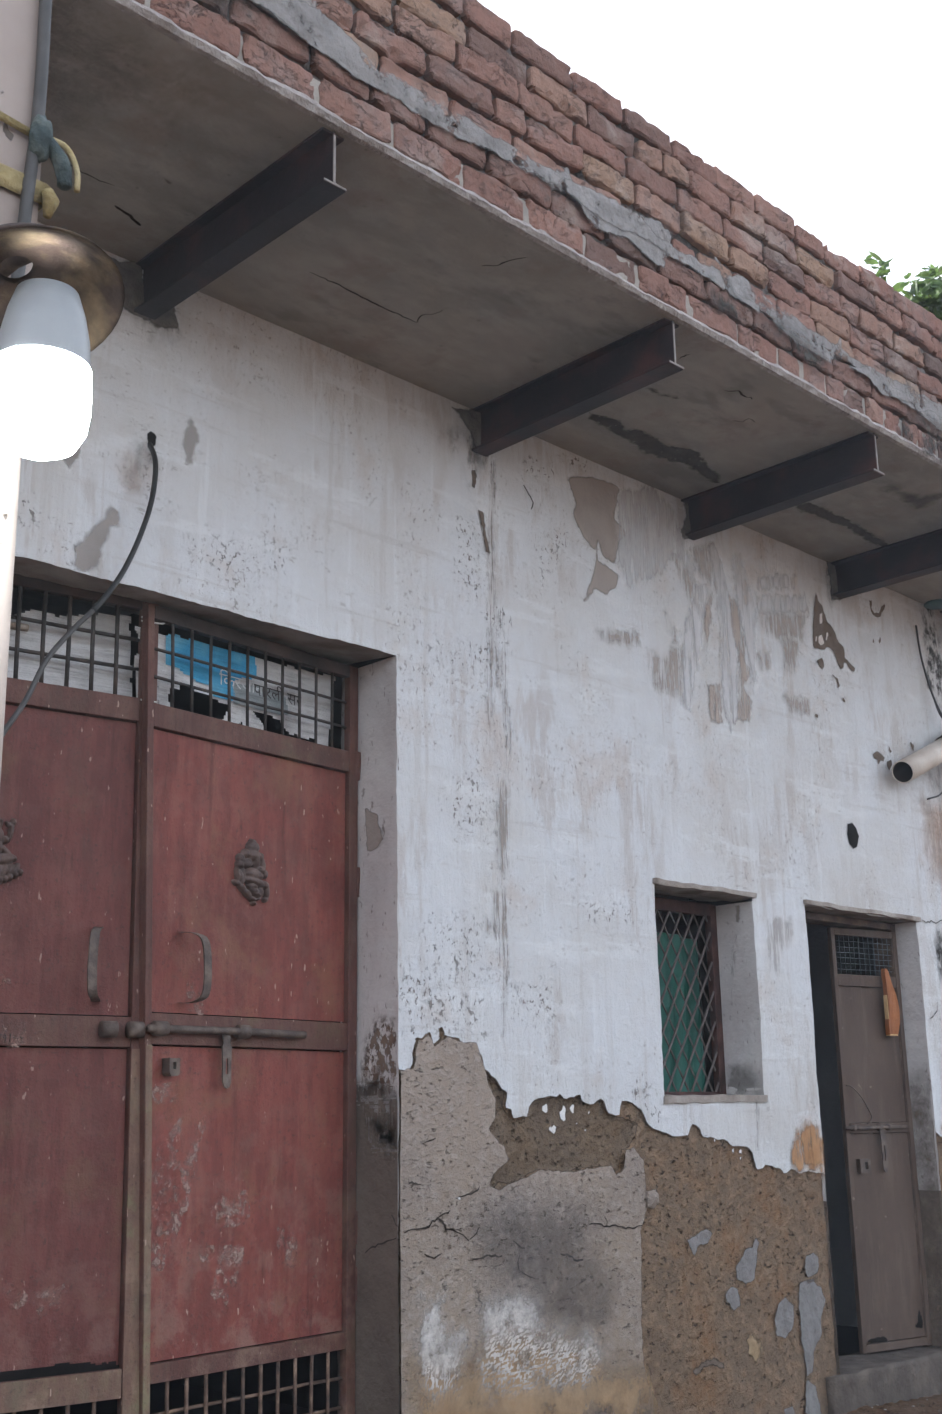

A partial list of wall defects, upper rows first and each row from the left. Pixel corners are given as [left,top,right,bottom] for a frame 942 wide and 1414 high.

crack [310,272,442,323]
peeling [75,508,119,572]
peeling [526,457,625,601]
peeling [675,548,712,641]
peeling [709,580,855,723]
water stain [496,783,508,872]
water stain [487,893,508,955]
flaking render [355,976,836,1414]
flaking render [933,1126,942,1222]